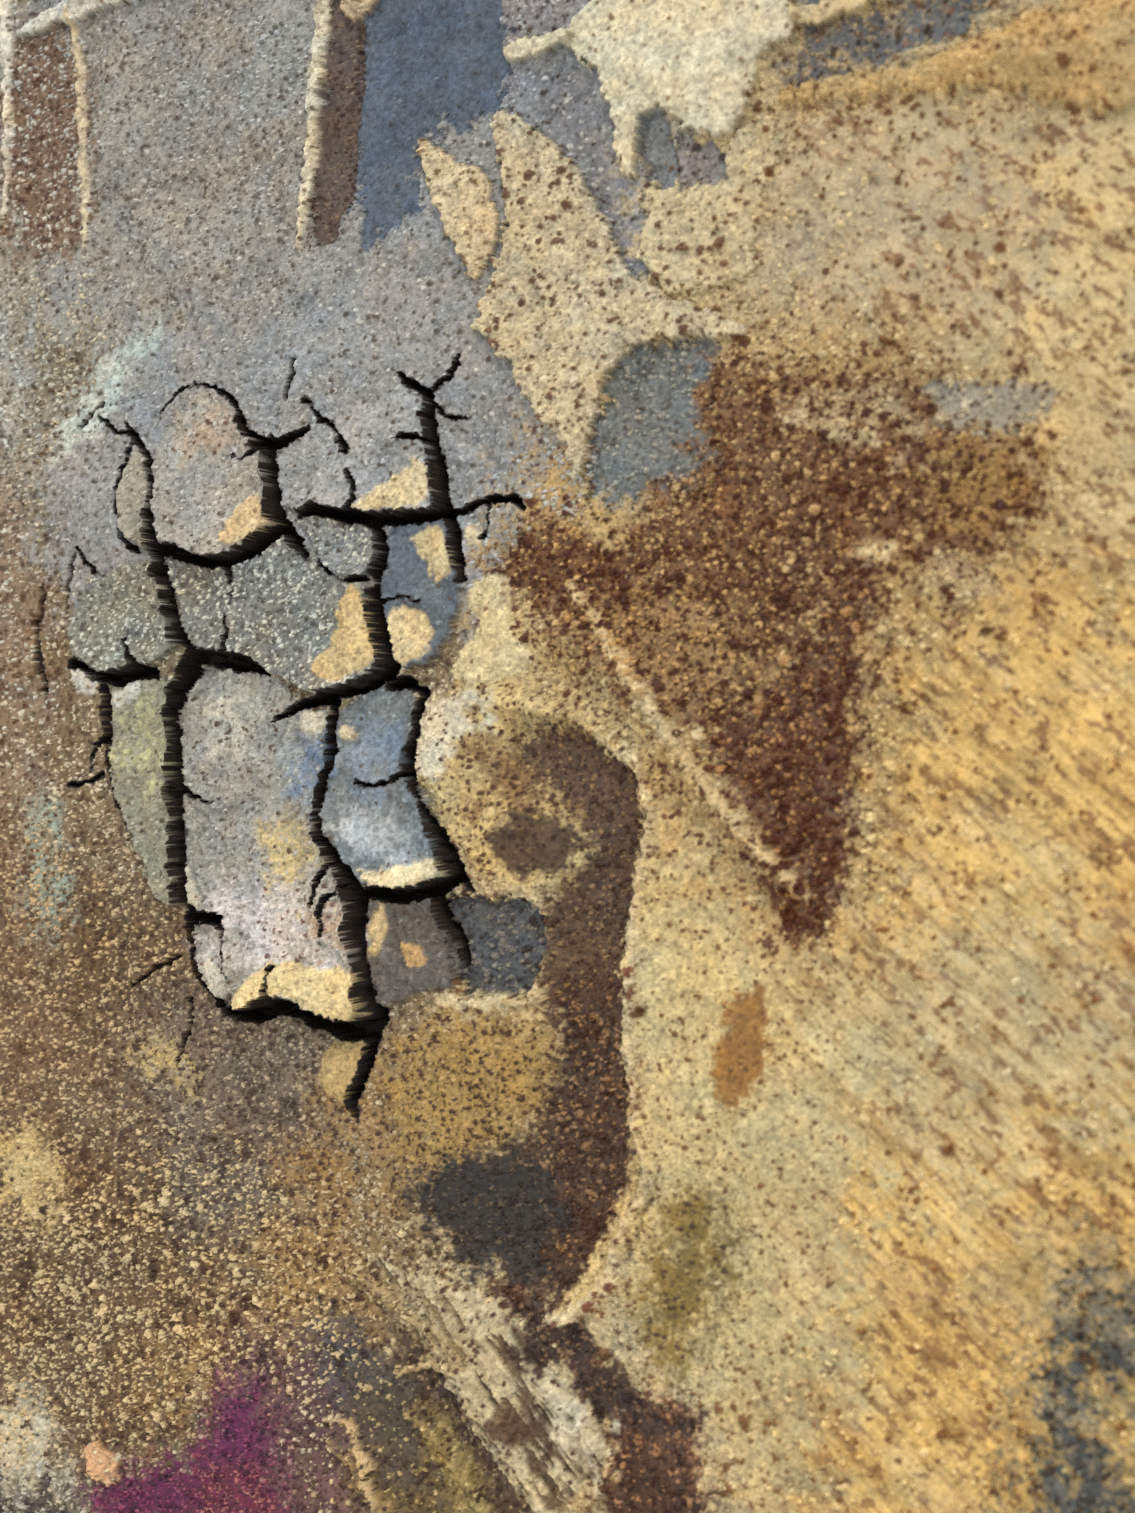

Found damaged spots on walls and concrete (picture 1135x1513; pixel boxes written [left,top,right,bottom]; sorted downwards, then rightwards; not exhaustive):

crack [38,357,527,1101]
peeling [308,0,892,522]
rust [475,342,1060,1513]
spalling [915,375,1060,439]